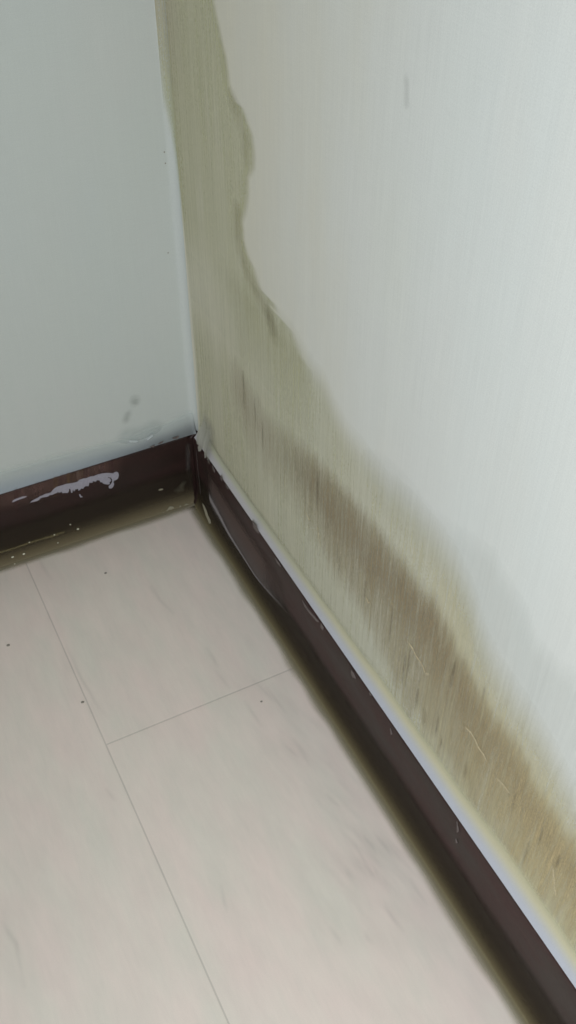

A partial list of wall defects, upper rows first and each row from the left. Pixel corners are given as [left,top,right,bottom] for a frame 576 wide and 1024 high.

peeling [12,472,119,503]
water stain [302,461,576,955]